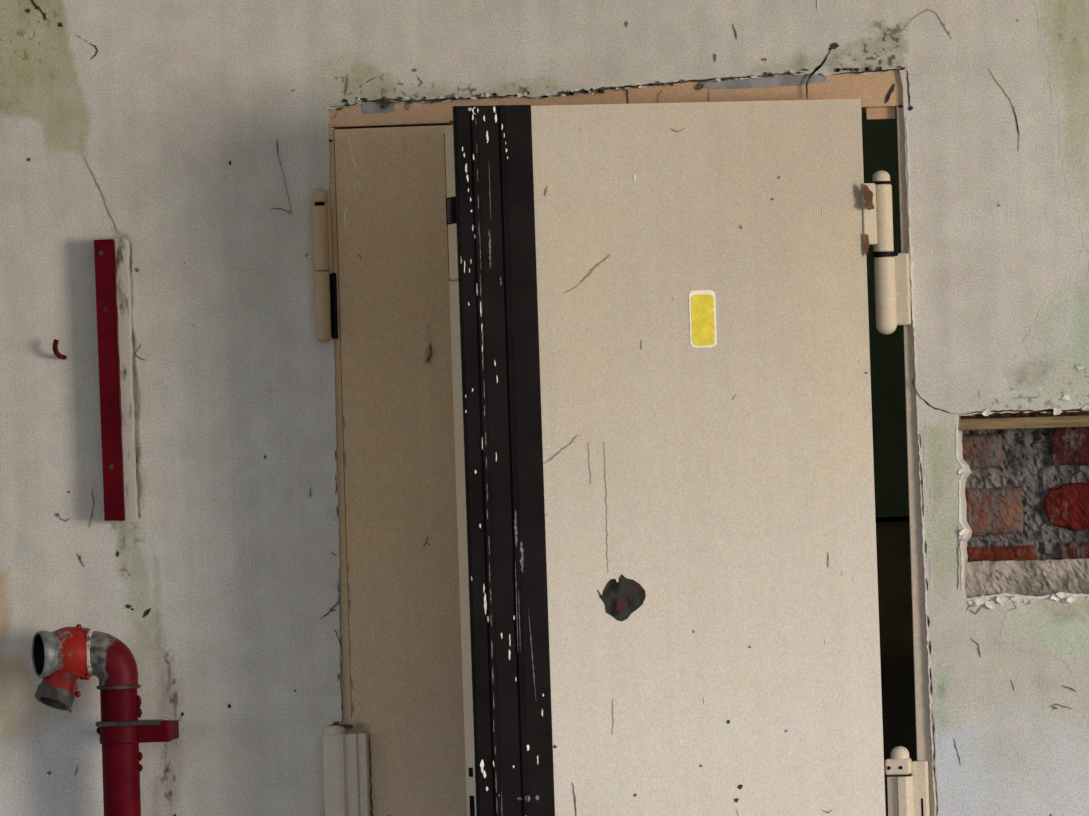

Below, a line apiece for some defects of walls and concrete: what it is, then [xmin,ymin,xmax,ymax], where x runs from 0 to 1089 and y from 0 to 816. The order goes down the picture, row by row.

crack [806,43,839,100]
crack [988,68,1020,150]
leakage [0,0,178,719]
crack [912,378,954,414]
spalling [956,394,1089,614]